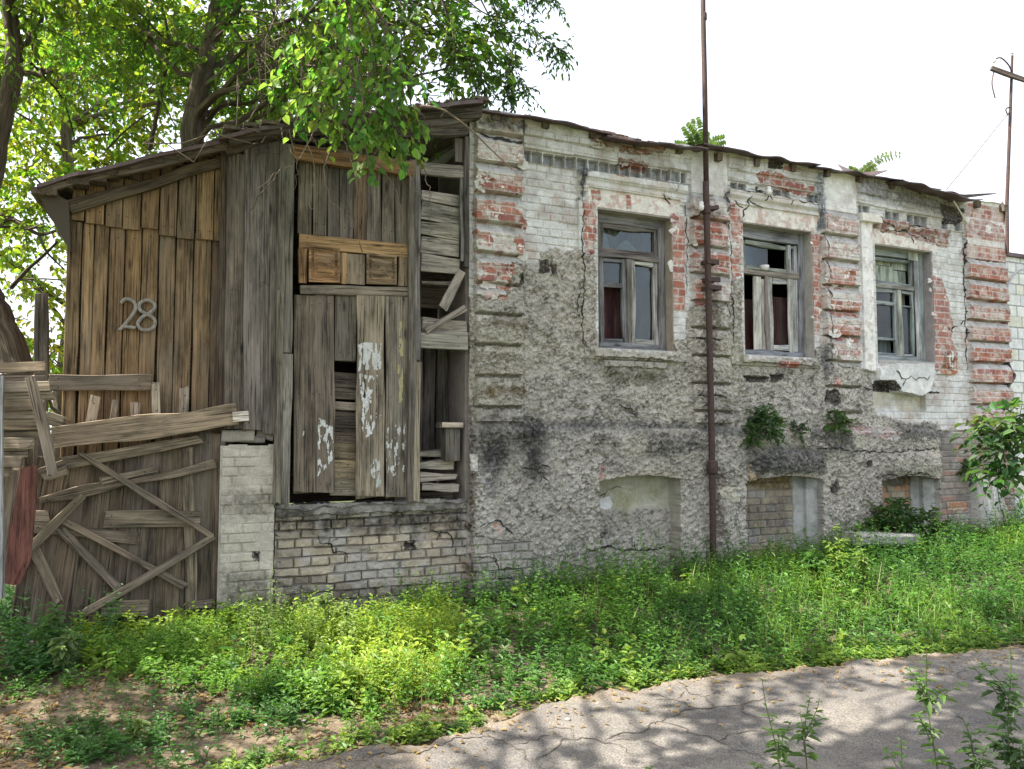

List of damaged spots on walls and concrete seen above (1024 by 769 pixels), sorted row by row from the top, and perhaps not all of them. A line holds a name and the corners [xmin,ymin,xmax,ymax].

peeling [357,342,406,488]
peeling [471,174,528,301]
crack [577,172,589,353]
peeling [667,203,743,312]
crack [692,191,834,371]
peeling [810,213,861,358]
crack [896,370,940,394]
peeling [927,275,958,377]
crack [480,519,513,535]